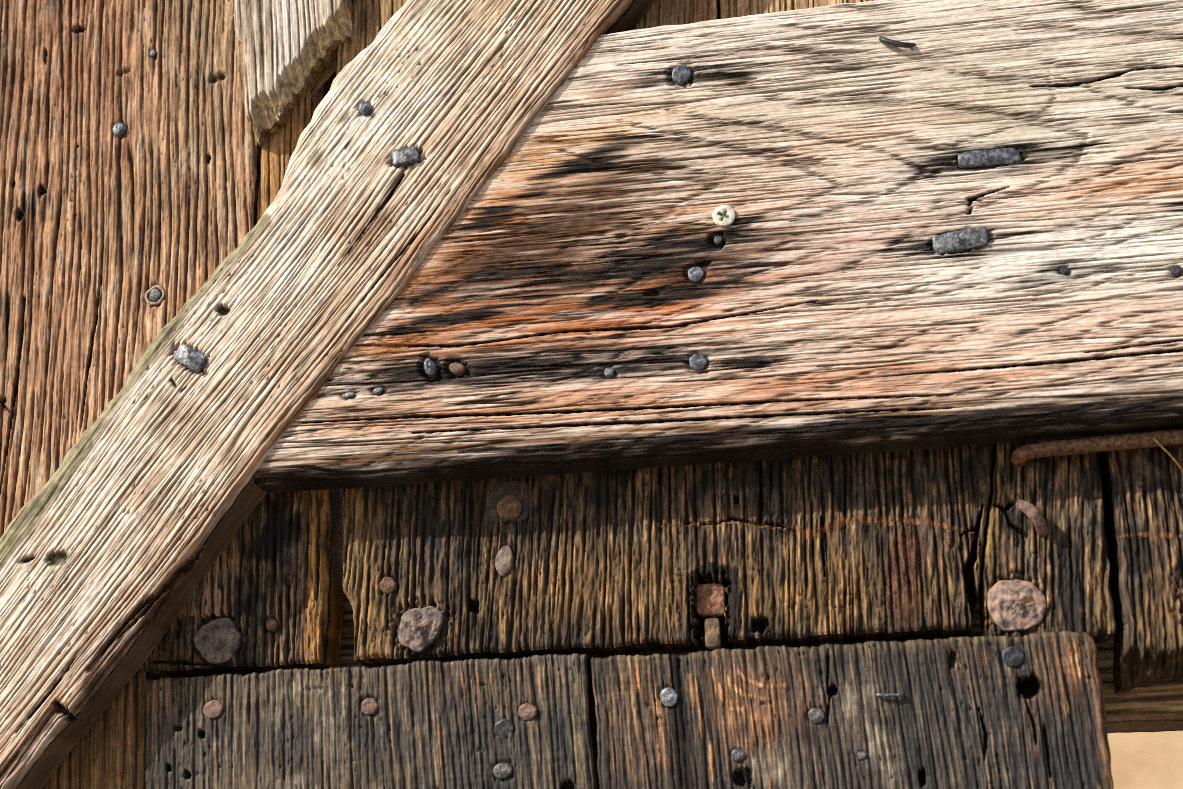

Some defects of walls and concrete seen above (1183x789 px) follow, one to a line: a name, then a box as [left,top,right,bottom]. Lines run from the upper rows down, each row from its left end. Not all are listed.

crack [1031,65,1183,91]
water stain [324,135,804,402]
corrosion [660,513,976,632]
crack [819,516,827,577]
crack [959,504,1028,620]